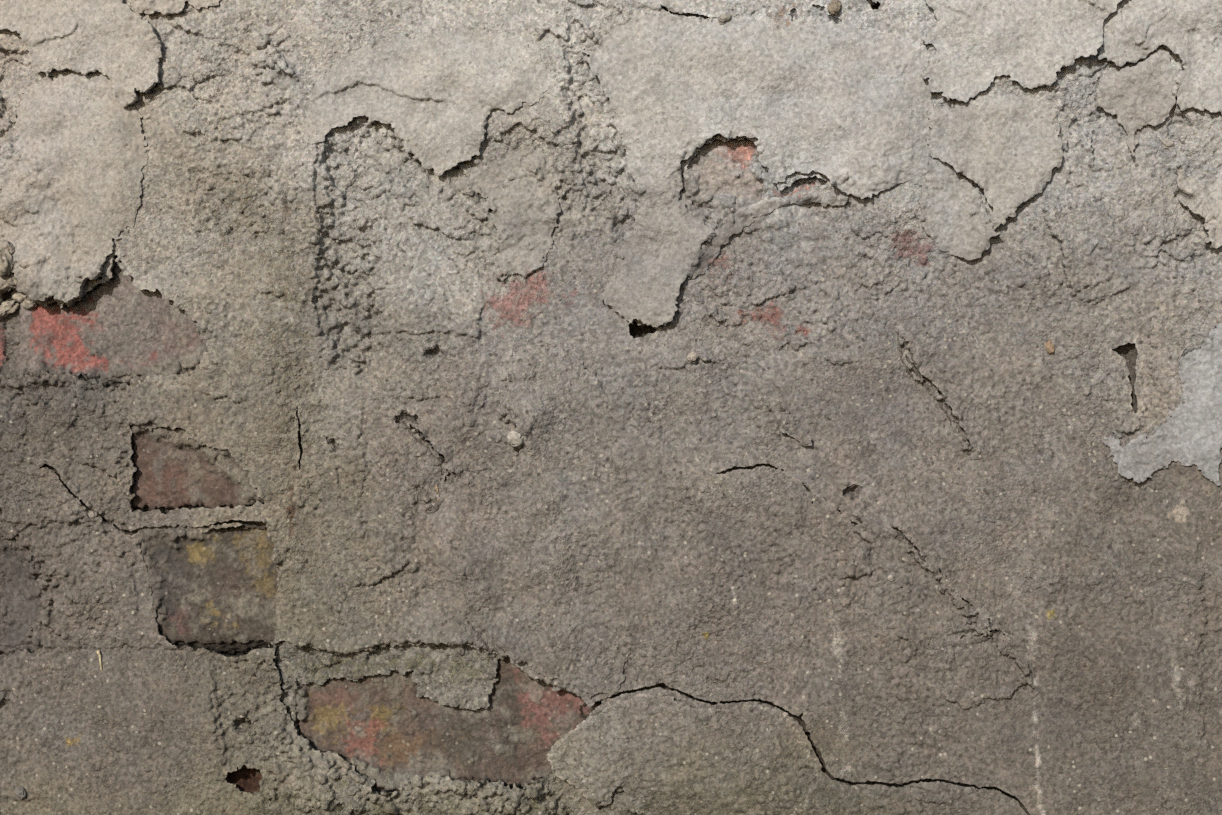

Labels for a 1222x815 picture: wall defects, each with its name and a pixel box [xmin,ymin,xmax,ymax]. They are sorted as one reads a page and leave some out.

flaking render [0,0,220,388]
flaking render [299,26,561,281]
flaking render [580,0,1222,327]
spalling [0,533,45,654]
spalling [130,424,597,792]
crack [716,463,1015,650]
crack [579,682,1030,815]